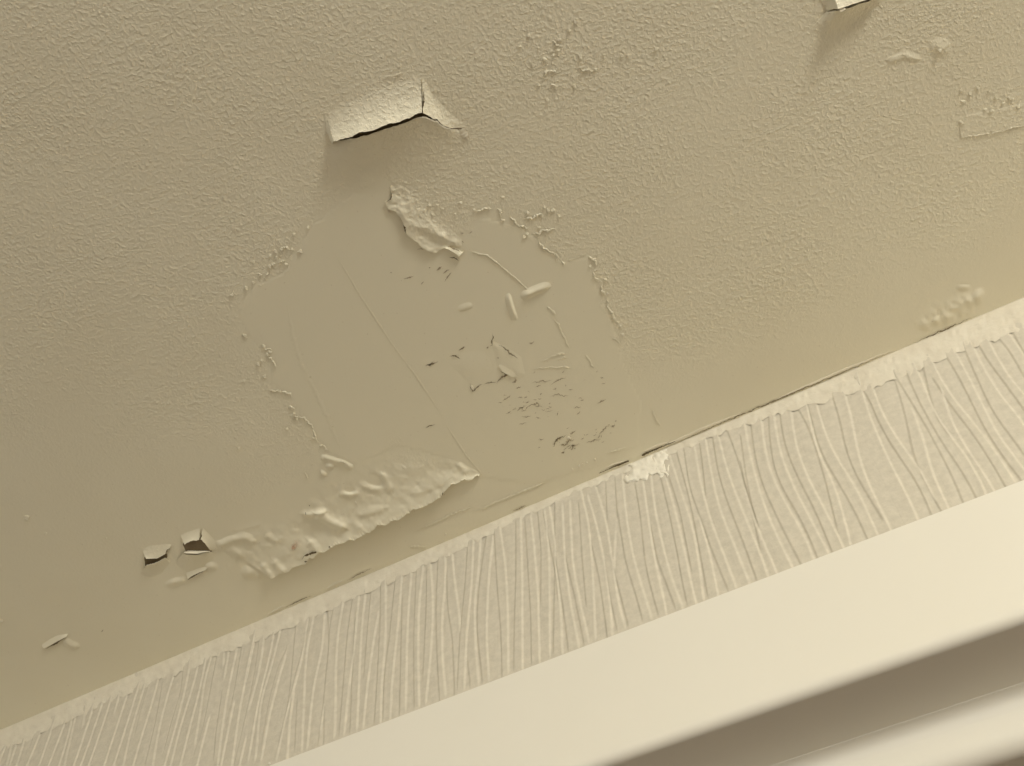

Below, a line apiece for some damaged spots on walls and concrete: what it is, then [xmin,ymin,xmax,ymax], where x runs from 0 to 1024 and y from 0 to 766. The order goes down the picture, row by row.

peeling [809,0,883,38]
peeling [313,72,565,265]
peeling [141,447,480,582]